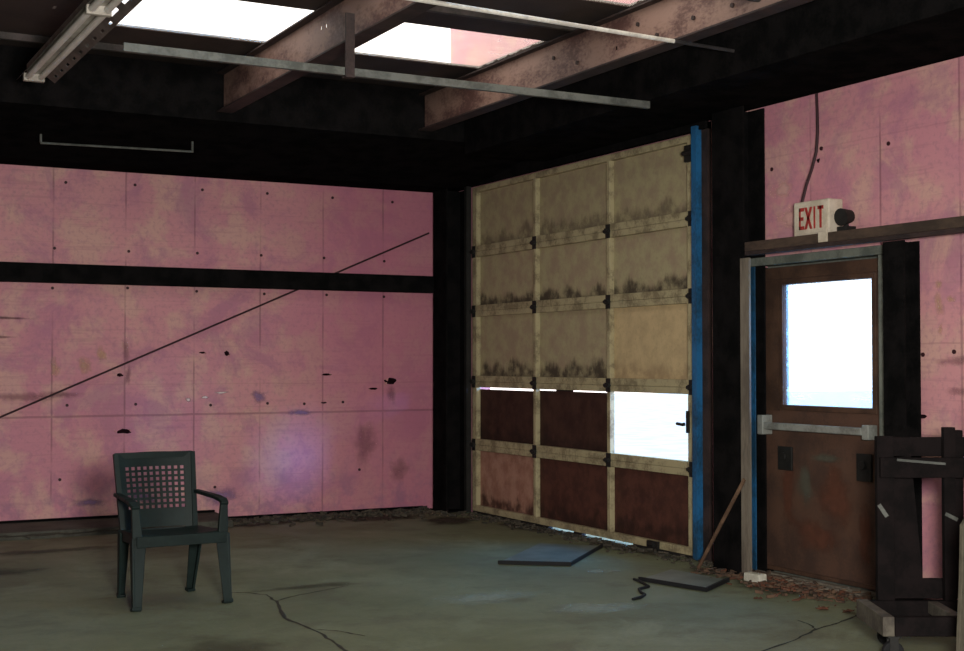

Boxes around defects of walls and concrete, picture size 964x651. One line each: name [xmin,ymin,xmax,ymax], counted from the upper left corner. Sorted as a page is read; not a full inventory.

crack [232,585,364,651]